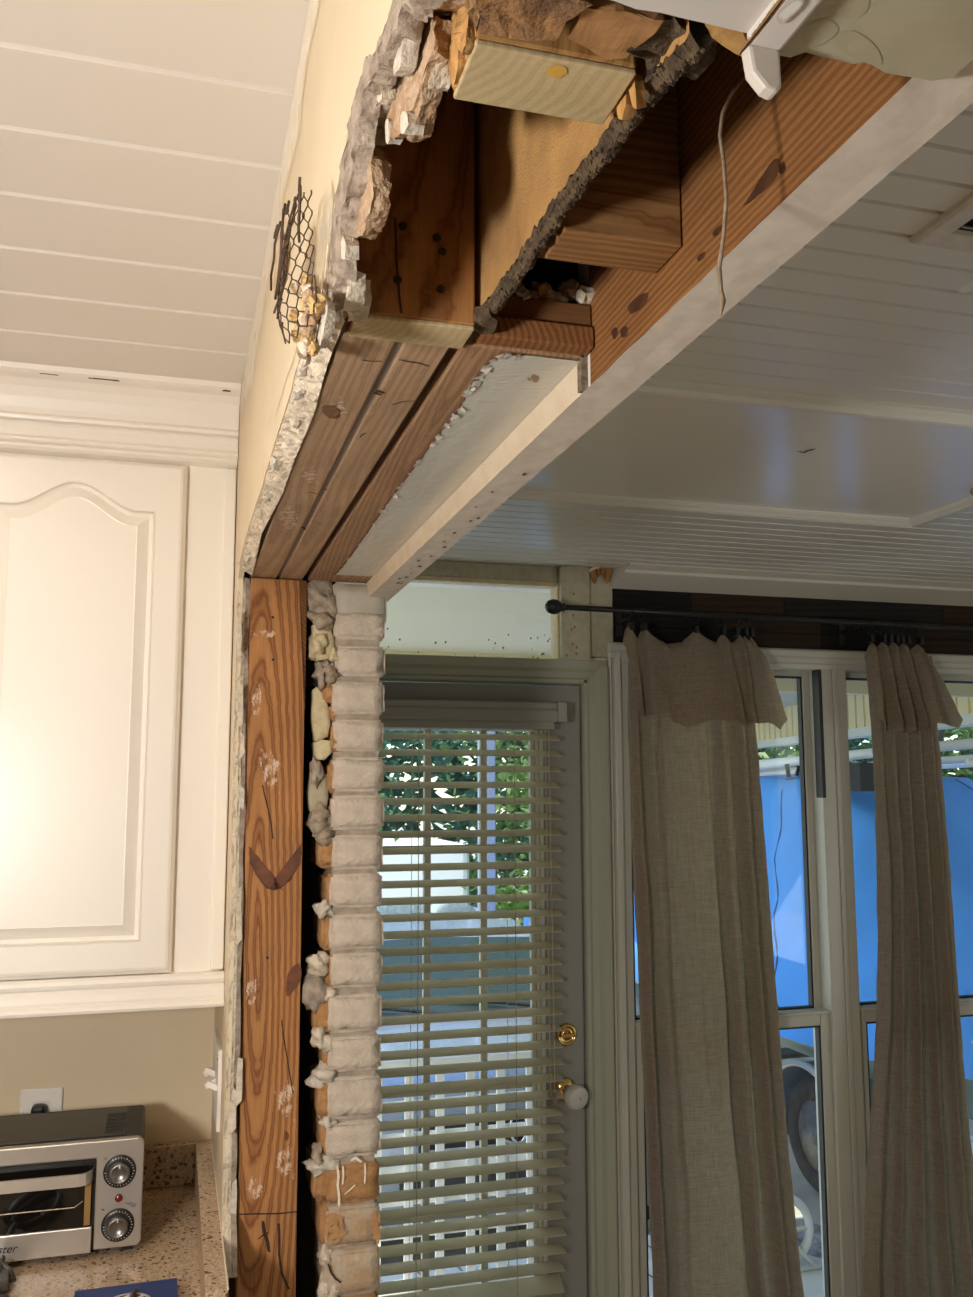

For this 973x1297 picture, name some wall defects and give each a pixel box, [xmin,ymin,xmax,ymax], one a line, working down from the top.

spalling [218,0,465,1297]
peeling [335,353,523,575]